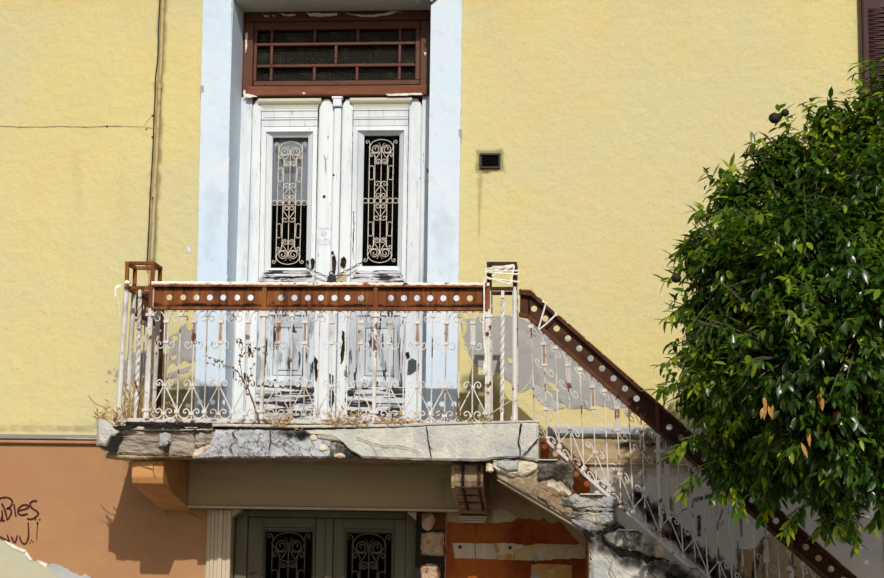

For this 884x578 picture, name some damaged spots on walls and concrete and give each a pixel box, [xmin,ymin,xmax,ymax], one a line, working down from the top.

flaking render [105,350,152,388]
flaking render [460,315,640,410]
spalling [104,425,215,461]
spalling [309,434,362,459]
crack [494,423,538,459]
flaking render [0,540,91,578]